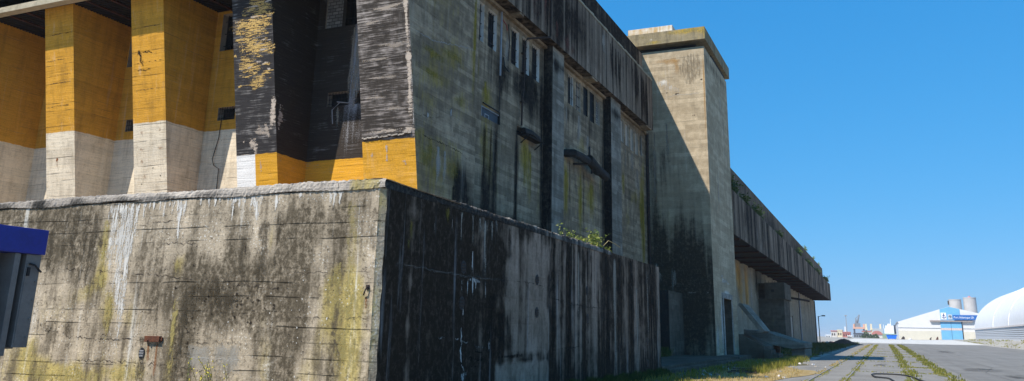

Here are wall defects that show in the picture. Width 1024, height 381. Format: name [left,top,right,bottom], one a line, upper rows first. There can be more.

peeling [234,0,275,89]
leakage [107,200,187,346]
leakage [171,279,238,374]
leakage [200,196,281,287]
leakage [452,212,522,358]
leakage [549,245,660,373]